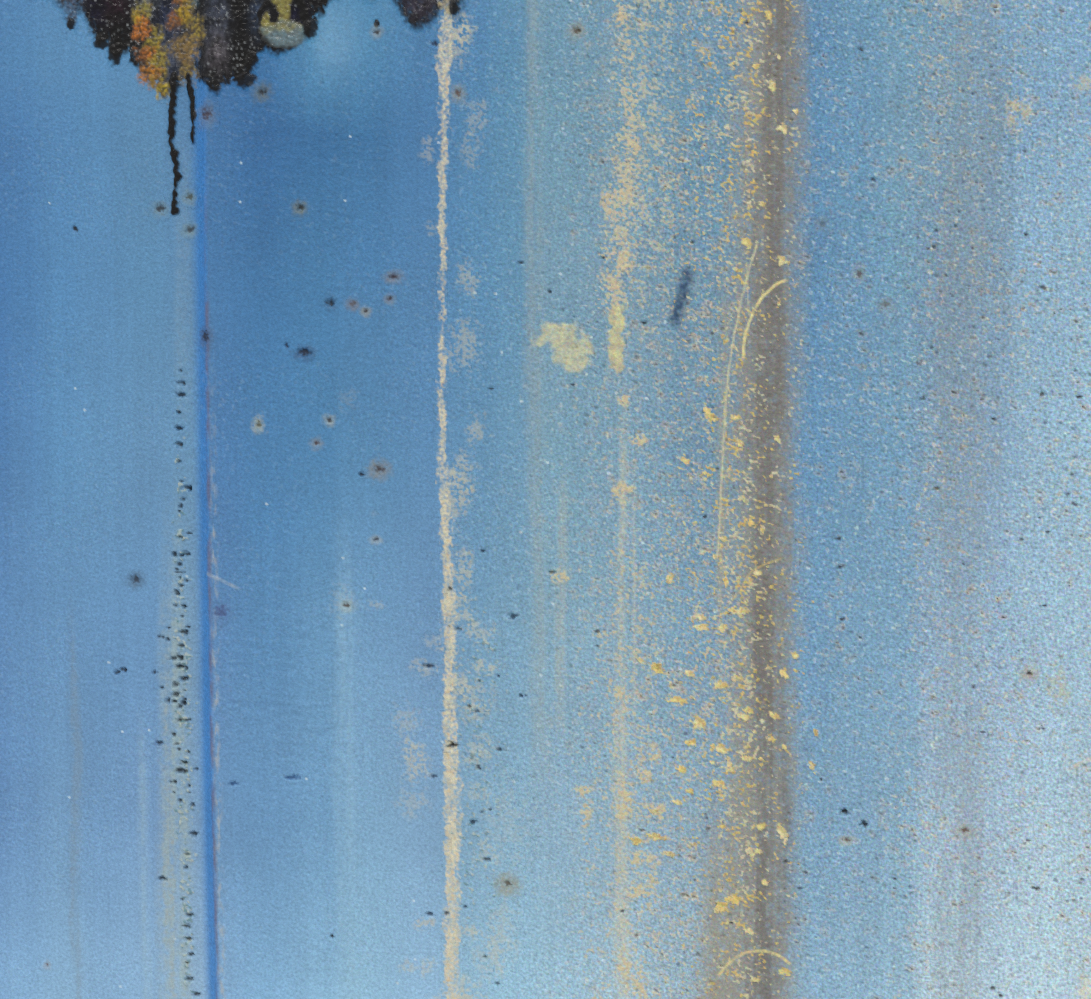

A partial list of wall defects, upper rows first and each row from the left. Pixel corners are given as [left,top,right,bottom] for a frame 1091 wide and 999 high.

corrosion [358,0,439,35]
corrosion [452,0,471,27]
corrosion [35,0,340,217]